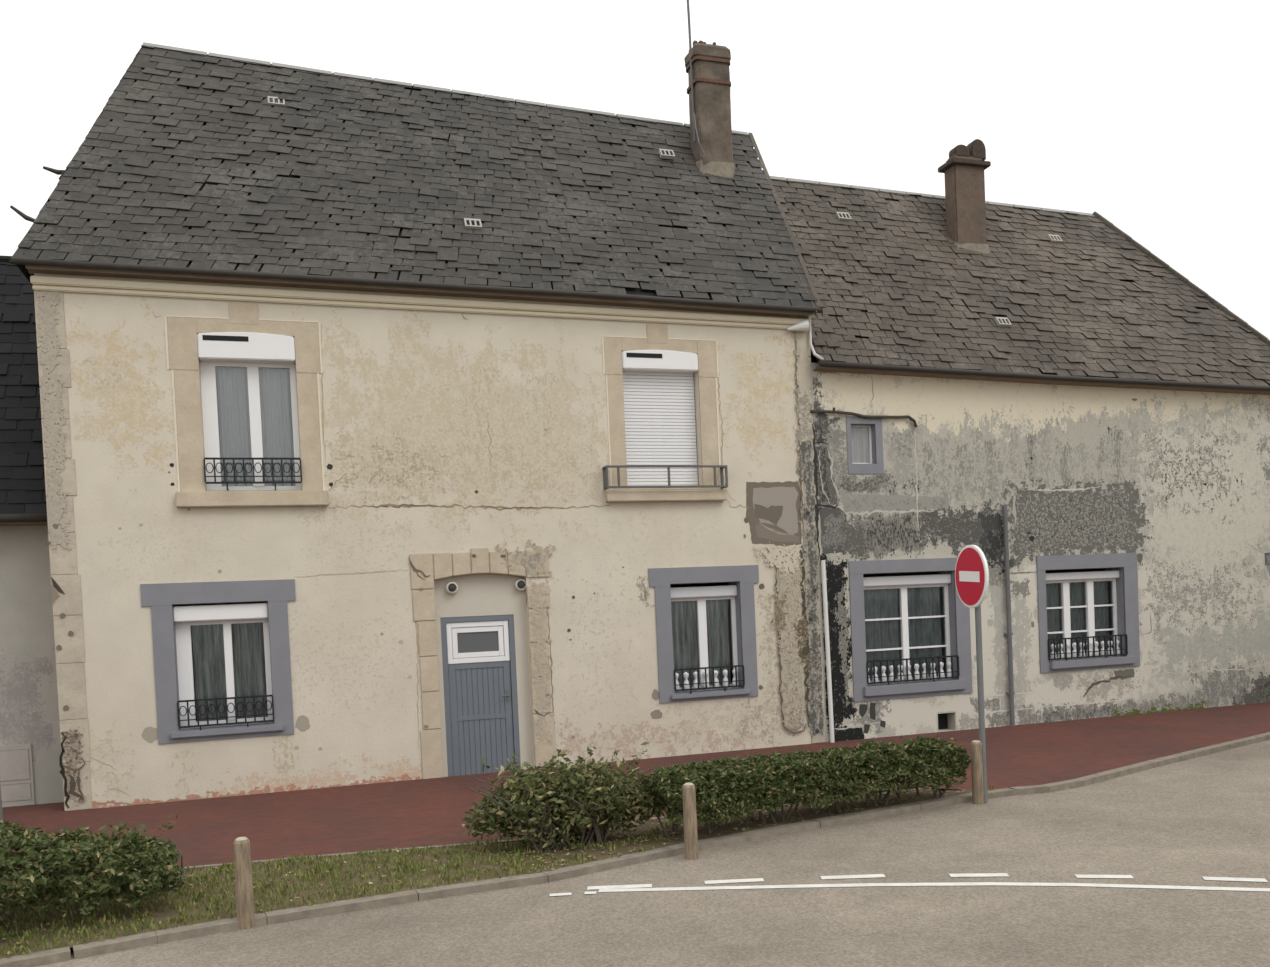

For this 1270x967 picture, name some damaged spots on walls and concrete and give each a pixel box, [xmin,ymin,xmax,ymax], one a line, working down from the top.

spalling [828,551,856,566]
spalling [1138,570,1148,589]
peeling [1114,668,1135,680]
peeling [859,702,886,733]